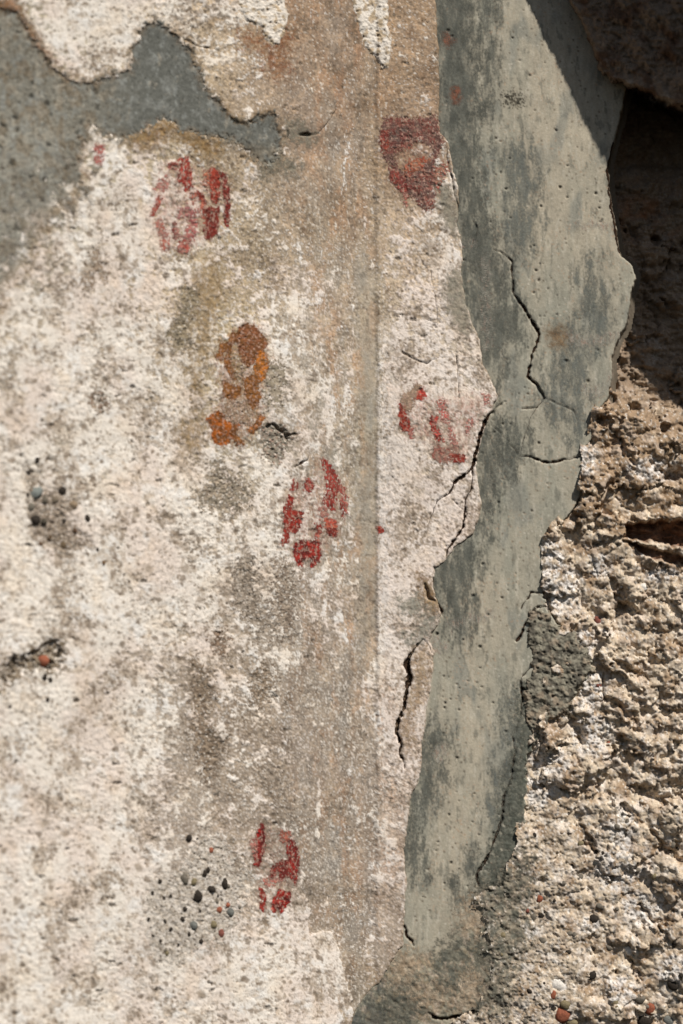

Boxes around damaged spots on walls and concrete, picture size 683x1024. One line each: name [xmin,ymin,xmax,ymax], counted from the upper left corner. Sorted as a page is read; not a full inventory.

peeling [0,1,283,284]
crack [501,252,545,409]
crack [433,413,491,556]
crack [523,437,580,464]
crack [395,640,431,768]
spalling [522,606,597,742]